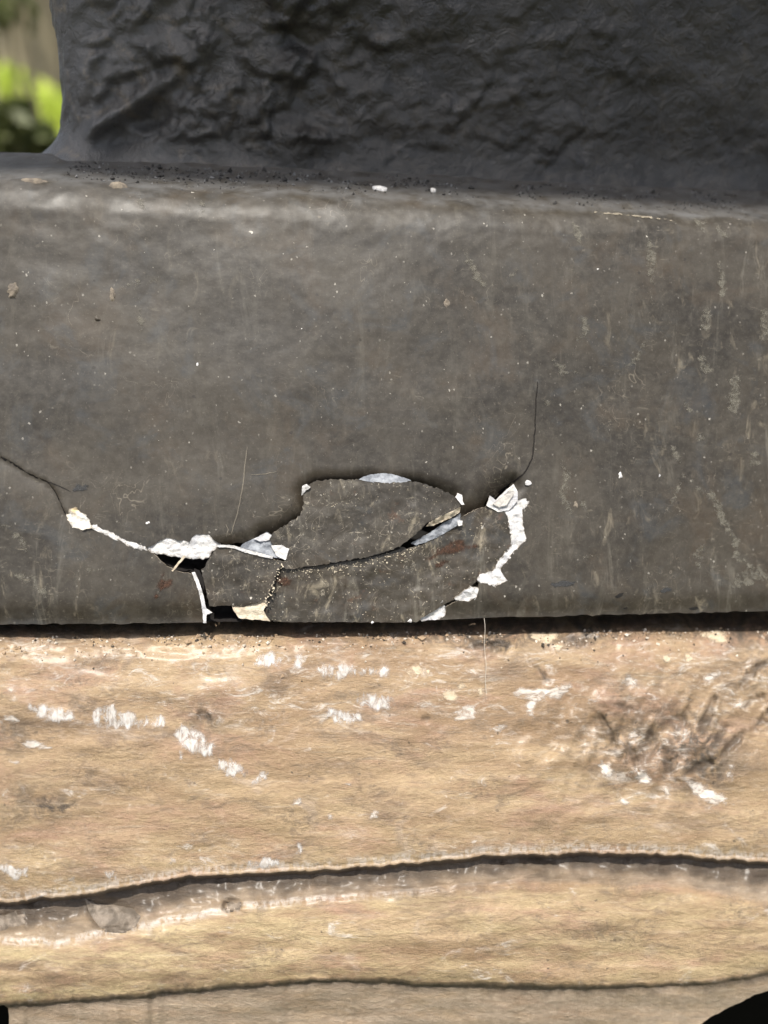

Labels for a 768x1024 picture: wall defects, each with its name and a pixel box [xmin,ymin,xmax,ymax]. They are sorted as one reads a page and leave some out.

crack [491,381,538,498]
crack [1,456,69,514]
peeling [67,480,532,623]
crack [290,547,414,582]
crack [192,569,212,623]